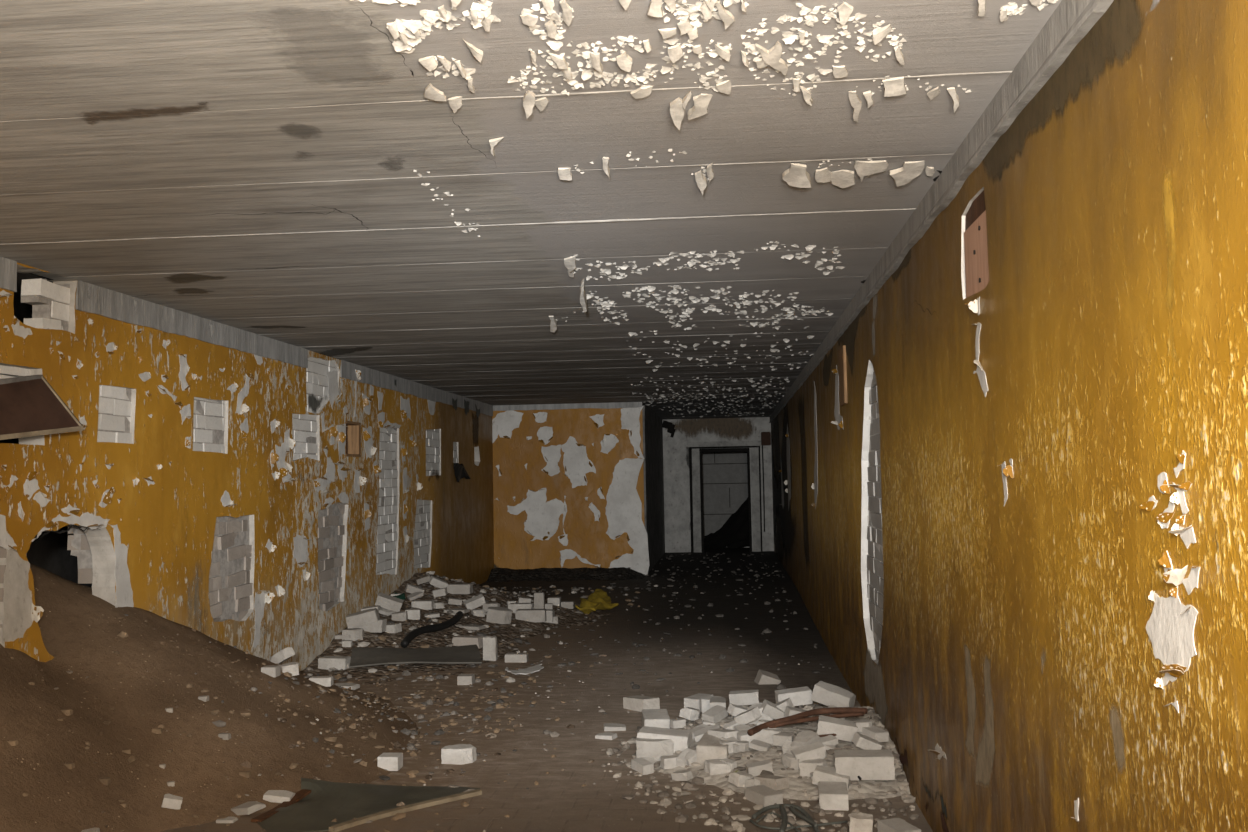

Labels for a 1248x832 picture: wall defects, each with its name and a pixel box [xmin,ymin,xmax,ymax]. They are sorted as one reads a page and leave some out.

peeling [350,0,501,113]
peeling [508,0,972,131]
peeling [1000,0,1058,22]
peeling [782,158,942,188]
spalling [0,278,83,379]
spalling [492,241,845,575]
peeling [965,297,988,397]
spalling [0,465,134,642]
spalling [209,491,285,648]
spalling [293,370,423,611]
peeling [1139,450,1197,549]
peeling [1146,551,1201,689]